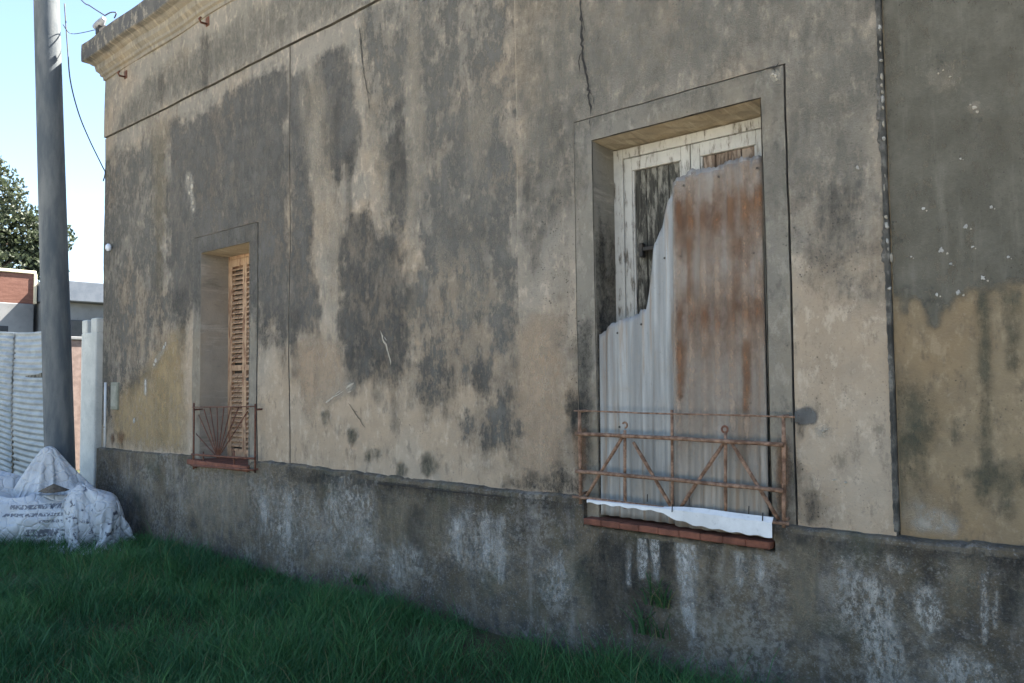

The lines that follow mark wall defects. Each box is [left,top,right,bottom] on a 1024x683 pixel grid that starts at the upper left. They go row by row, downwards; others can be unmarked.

crack [359,28,371,109]
crack [578,0,594,124]
leakage [102,0,1024,507]
leakage [254,466,509,581]
leakage [586,538,697,637]
leakage [833,560,905,683]
leakage [914,586,943,647]
leakage [933,654,997,683]